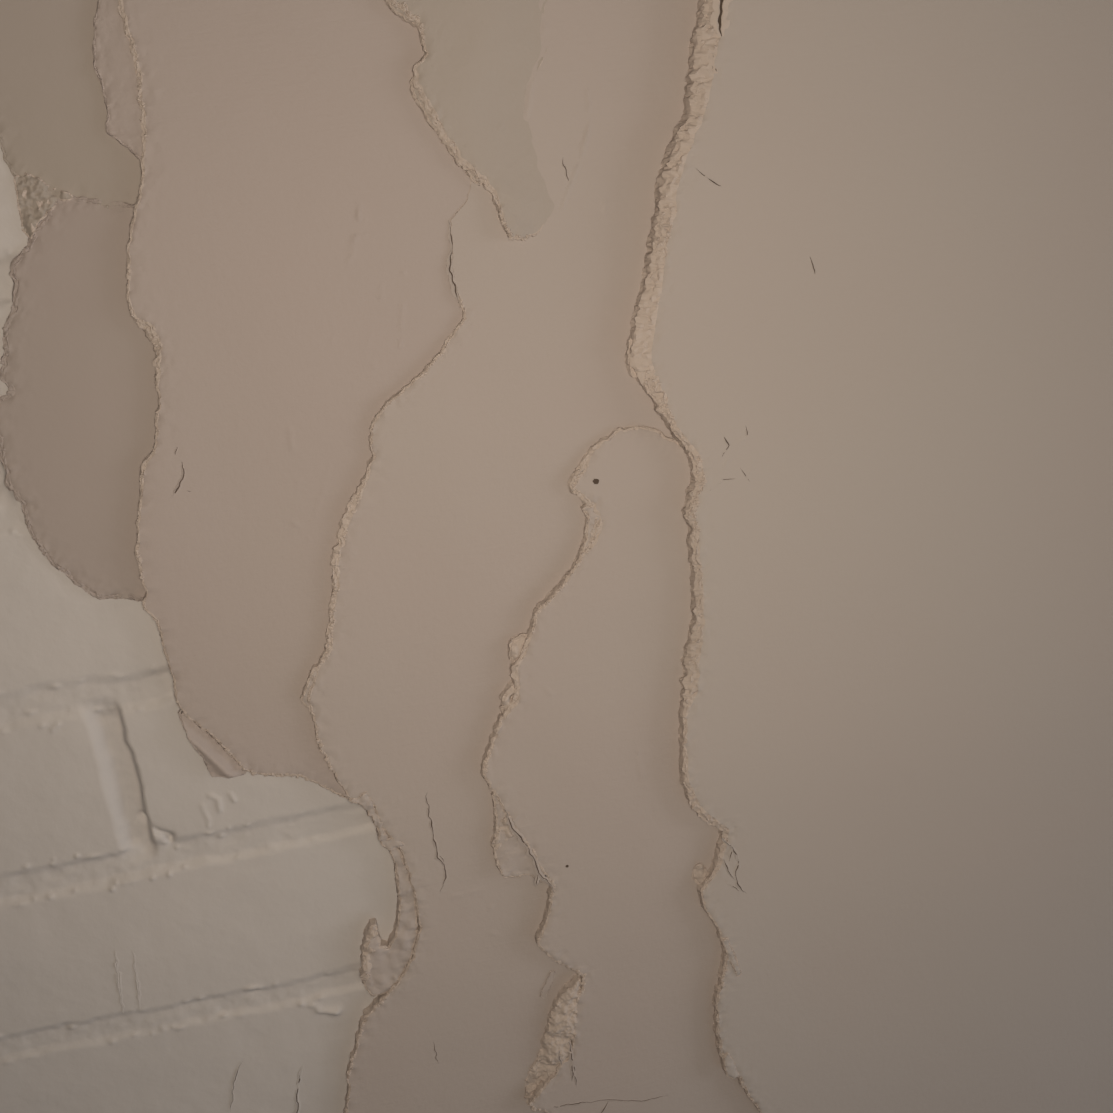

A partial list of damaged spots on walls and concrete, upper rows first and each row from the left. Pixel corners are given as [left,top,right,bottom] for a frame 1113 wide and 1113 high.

peeling [0,0,760,1113]
peeling [625,0,1113,1113]